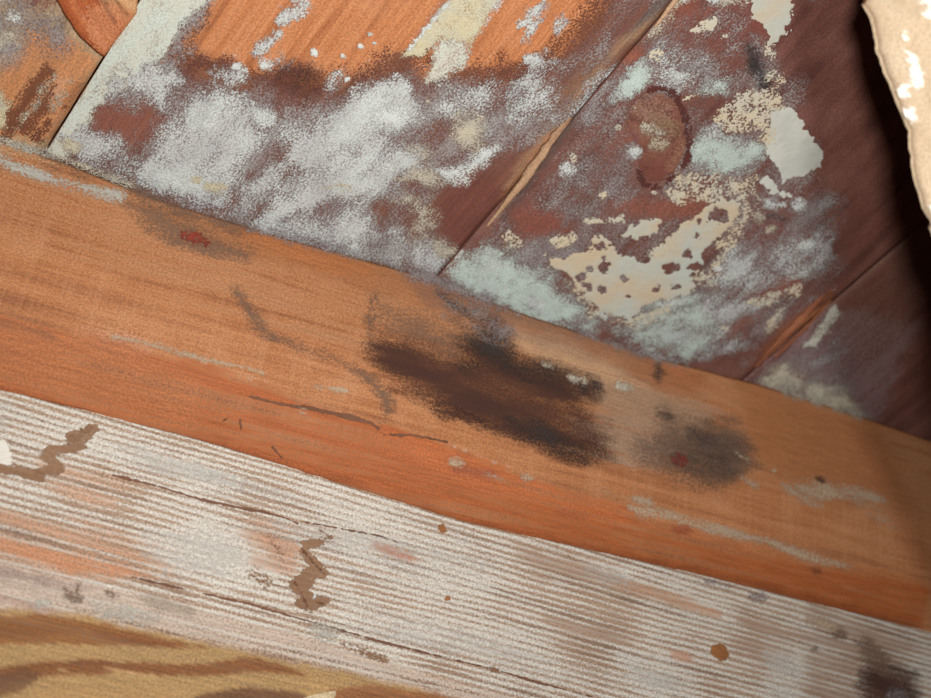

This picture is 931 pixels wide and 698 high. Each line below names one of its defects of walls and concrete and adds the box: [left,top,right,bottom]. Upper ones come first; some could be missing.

peeling [543,0,823,331]
peeling [501,230,523,249]
damp [638,419,759,490]